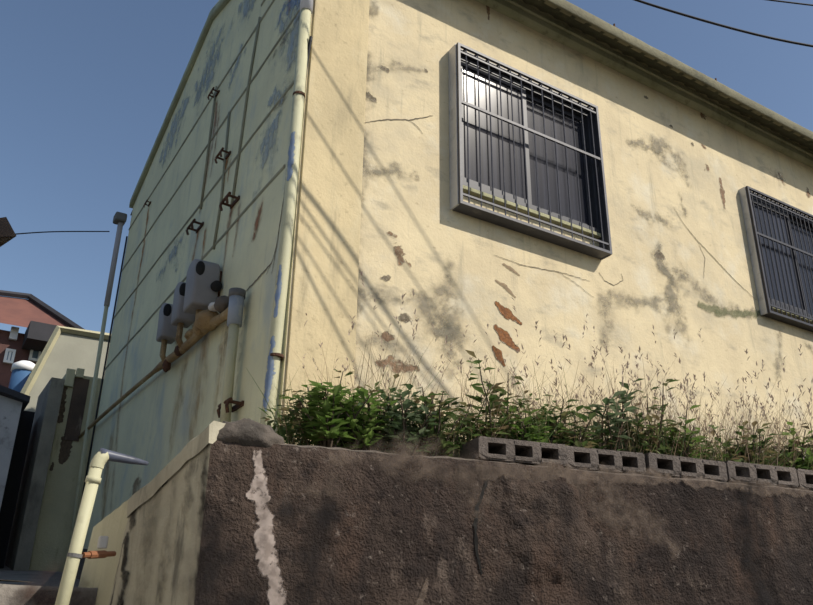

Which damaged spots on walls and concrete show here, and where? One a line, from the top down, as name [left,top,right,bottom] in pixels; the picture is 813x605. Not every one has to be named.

peeling [278,0,300,70]
peeling [159,27,223,164]
peeling [286,132,295,181]
crack [365,115,432,134]
peeling [387,231,411,267]
peeling [263,336,276,411]
damp [418,296,462,363]
spalling [492,324,520,367]
spalling [495,301,522,325]
damp [600,244,686,332]
damp [695,284,762,317]
damp [110,508,137,605]